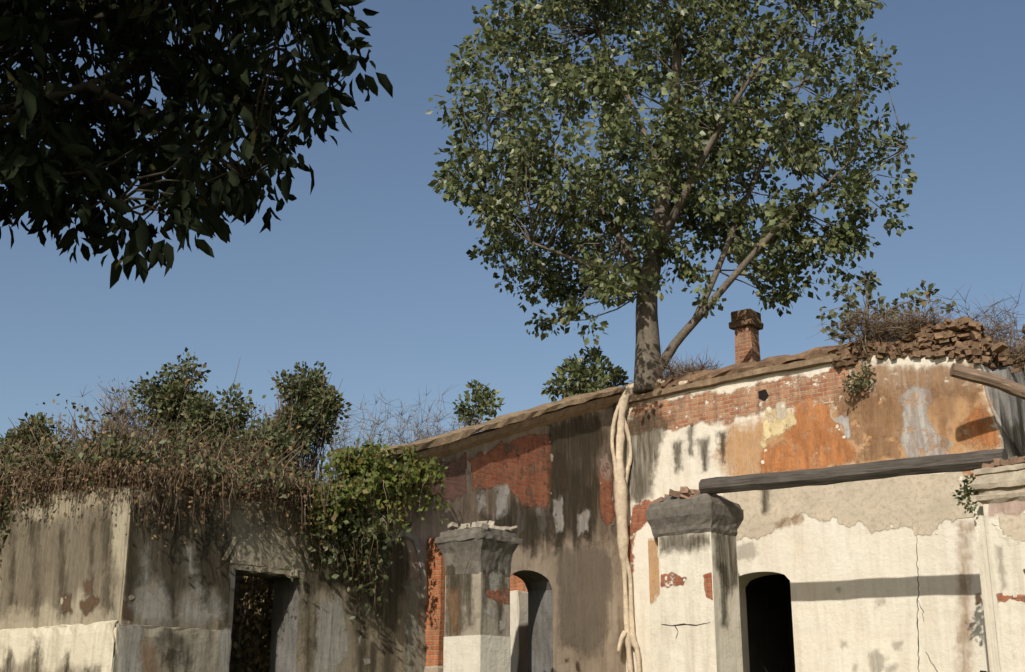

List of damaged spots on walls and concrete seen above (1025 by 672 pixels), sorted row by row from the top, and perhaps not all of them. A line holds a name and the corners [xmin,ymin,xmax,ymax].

spalling [627,366,855,473]
flaking render [900,387,951,458]
damp [0,498,230,672]
spalling [448,434,567,532]
damp [417,415,611,655]
spalling [577,453,616,536]
spalling [627,486,701,577]
spalling [648,539,687,603]
crack [661,622,710,637]
spalling [703,573,713,600]
flaking render [723,470,1025,545]
crack [916,536,938,672]